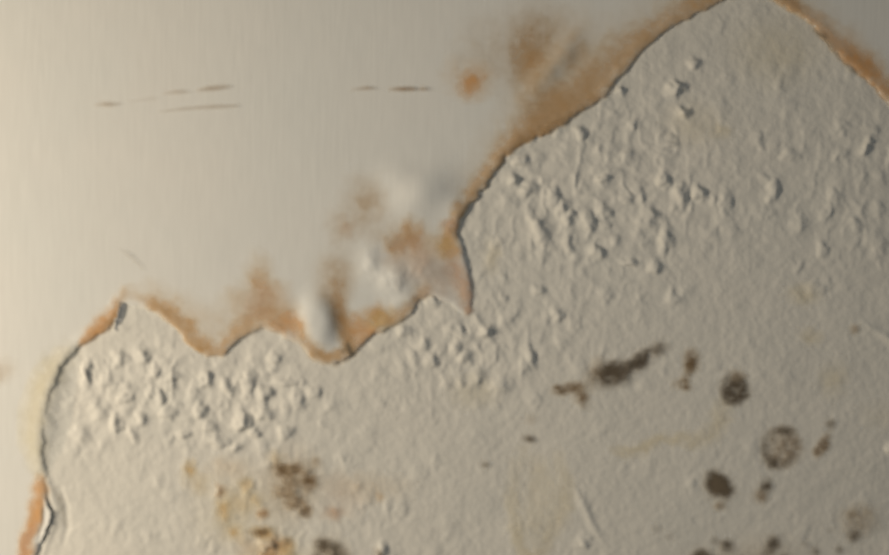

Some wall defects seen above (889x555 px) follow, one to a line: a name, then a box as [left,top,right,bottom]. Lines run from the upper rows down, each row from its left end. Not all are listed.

water stain [811,20,889,96]
water stain [443,0,715,257]
water stain [80,306,118,344]
water stain [148,299,270,355]
water stain [310,279,354,362]
water stain [595,350,650,385]
water stain [686,353,696,371]
water stain [554,384,587,403]
water stain [722,375,748,404]
water stain [276,464,314,516]
water stain [706,472,732,497]
water stain [316,540,340,555]